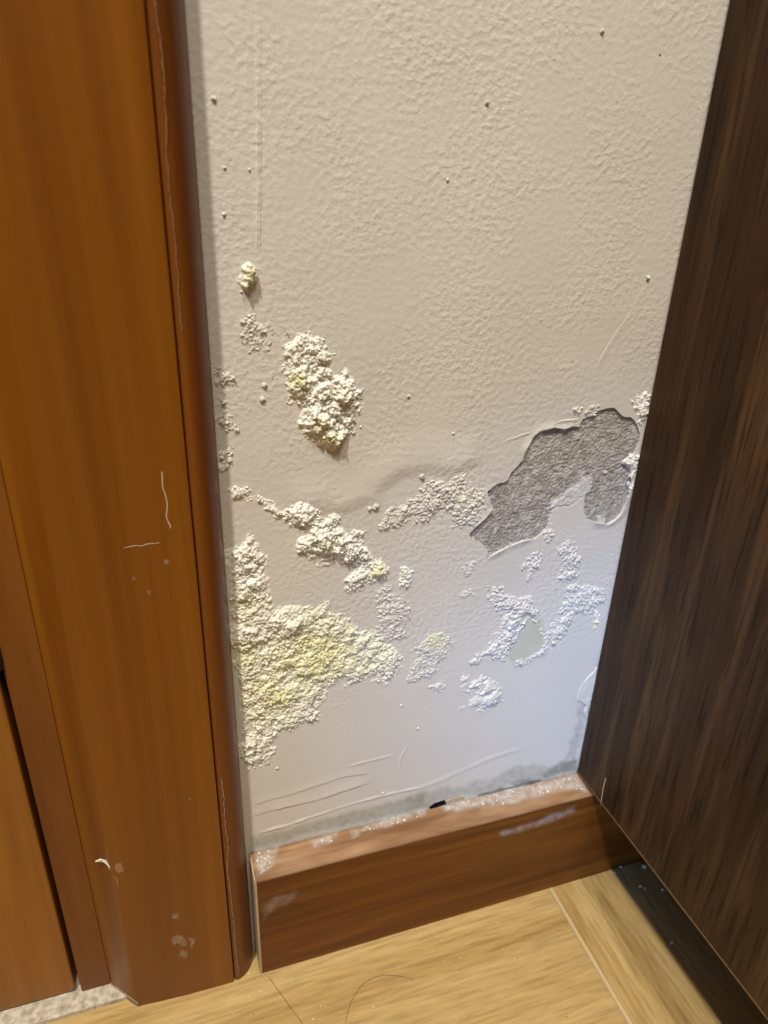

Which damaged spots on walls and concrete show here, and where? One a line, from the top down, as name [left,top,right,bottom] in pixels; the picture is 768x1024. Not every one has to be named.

damp [237,261,258,293]
damp [272,331,365,451]
spalling [466,408,639,562]
damp [224,530,405,772]
damp [511,621,545,660]